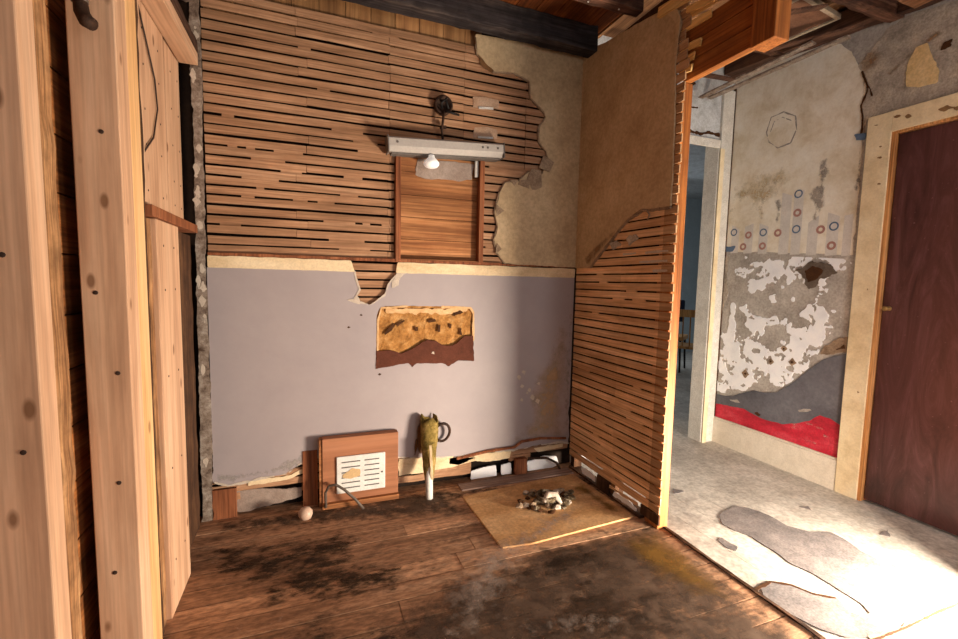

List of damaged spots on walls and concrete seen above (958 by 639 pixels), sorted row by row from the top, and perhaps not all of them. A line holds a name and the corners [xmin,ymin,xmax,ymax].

spalling [858,0,958,126]
spalling [474,36,554,264]
spalling [348,270,406,305]
spalling [415,310,463,335]
peeling [715,246,852,458]
peeling [398,450,512,480]
peeling [527,443,563,471]